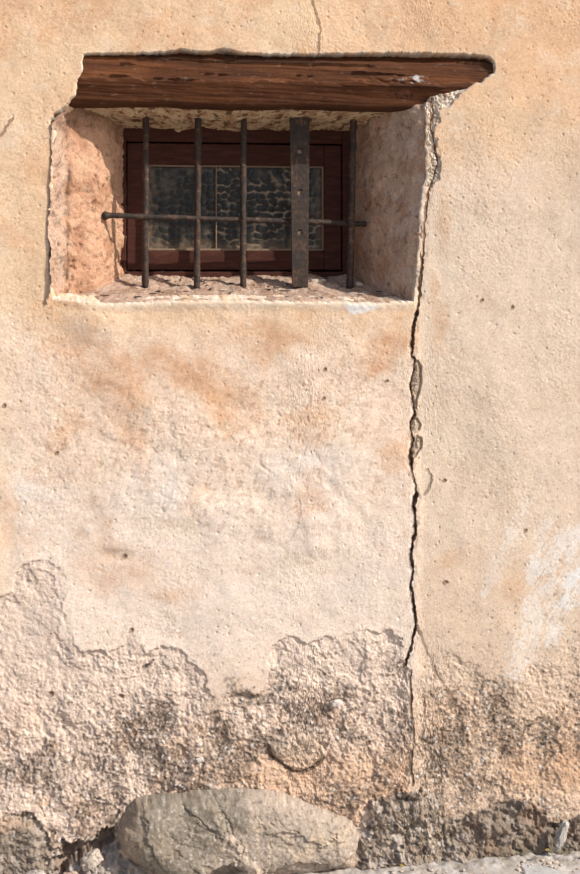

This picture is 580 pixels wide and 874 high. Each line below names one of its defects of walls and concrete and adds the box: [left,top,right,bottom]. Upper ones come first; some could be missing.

crack [312,0,322,57]
flaking render [424,89,467,189]
crack [404,97,476,786]
flaking render [0,558,580,874]